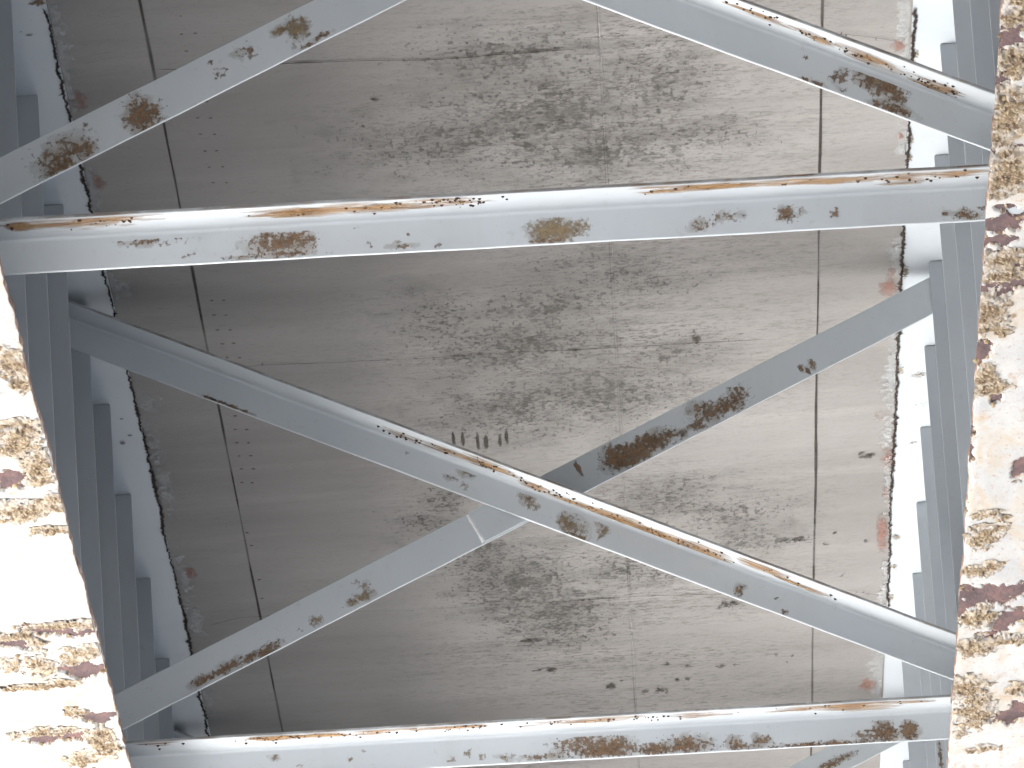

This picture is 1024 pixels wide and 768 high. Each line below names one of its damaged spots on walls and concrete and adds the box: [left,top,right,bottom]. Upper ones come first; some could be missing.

corrosion [725,0,960,117]
peeling [988,0,1024,201]
corrosion [248,197,485,217]
corrosion [942,203,1024,251]
peeling [978,247,1024,339]
corrosion [599,386,749,475]
peeling [0,416,69,537]
corrosion [377,425,837,600]
peeling [961,508,1013,579]
peeling [0,618,100,692]
corrosion [501,701,930,768]
peeling [951,672,1024,754]